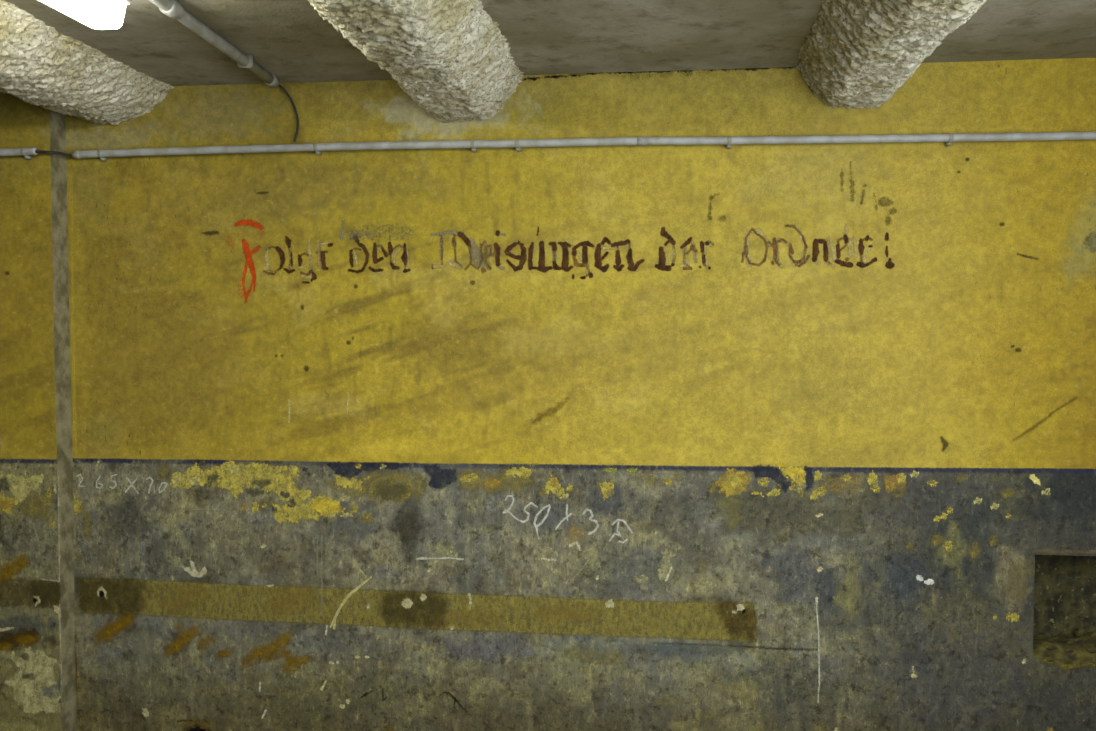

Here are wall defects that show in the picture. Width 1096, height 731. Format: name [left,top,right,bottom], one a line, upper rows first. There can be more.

peeling [0,470,61,582]
peeling [160,459,532,524]
peeling [540,474,573,500]
peeling [710,463,937,527]